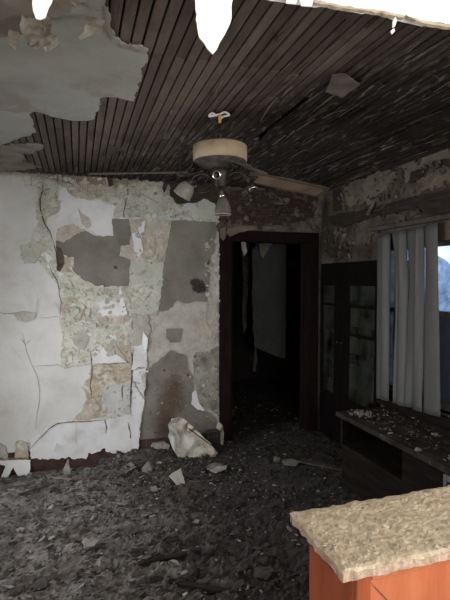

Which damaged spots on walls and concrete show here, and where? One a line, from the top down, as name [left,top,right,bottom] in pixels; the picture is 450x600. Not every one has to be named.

peeling [8,0,59,53]
peeling [195,0,233,55]
peeling [286,0,450,35]
crack [0,187,62,318]
leakage [190,279,206,293]
flaking render [0,148,450,477]
crack [21,333,145,418]
crack [30,414,102,449]